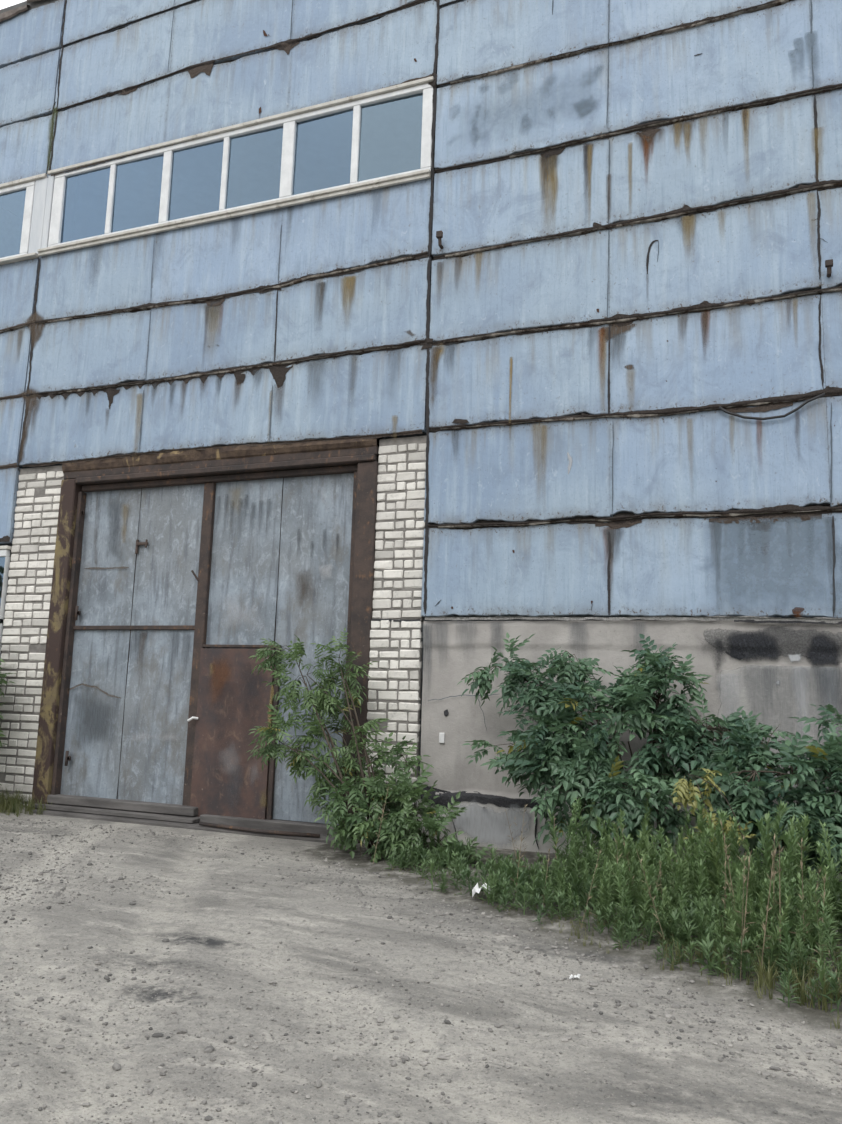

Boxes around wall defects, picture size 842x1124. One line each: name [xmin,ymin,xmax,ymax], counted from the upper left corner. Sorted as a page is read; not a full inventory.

corrosion [675,122,691,143]
corrosion [542,155,556,199]
corrosion [629,130,660,180]
water stain [717,632,779,665]